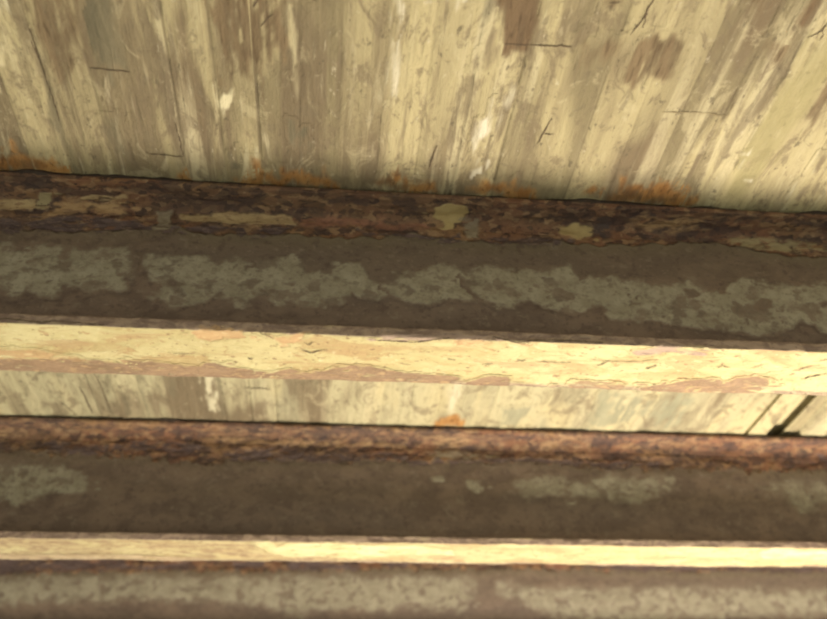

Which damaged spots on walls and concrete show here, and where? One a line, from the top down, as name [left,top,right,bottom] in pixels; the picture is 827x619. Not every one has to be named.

leakage [7,0,134,174]
leakage [198,0,289,109]
leakage [466,0,548,75]
leakage [570,0,705,96]
leakage [716,0,827,210]
corrosion [0,133,82,174]
corrosion [0,190,142,217]
corrosion [224,152,343,189]
corrosion [152,163,545,240]
corrosion [555,221,608,243]
corrosion [576,168,716,238]
corrosion [203,411,508,461]